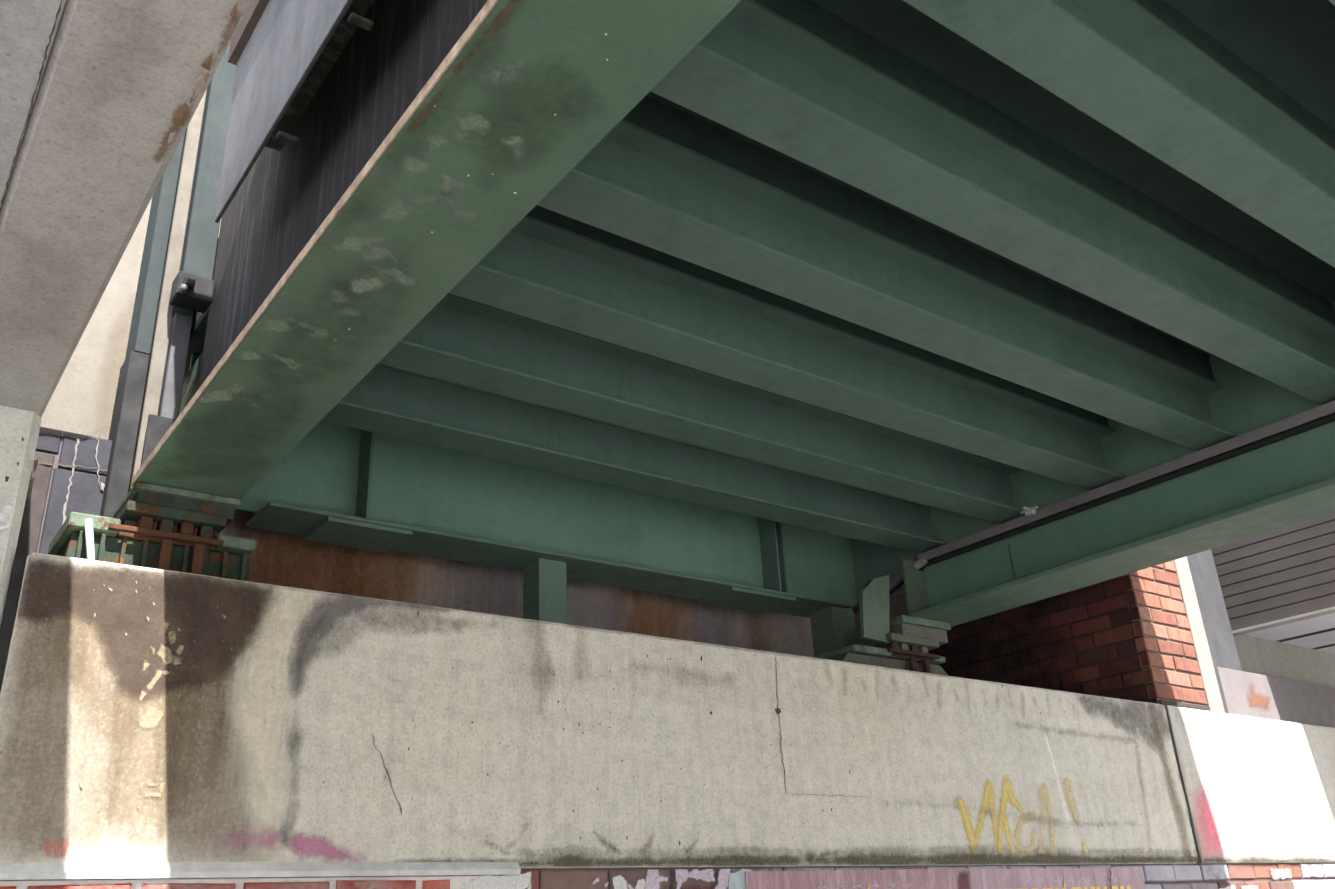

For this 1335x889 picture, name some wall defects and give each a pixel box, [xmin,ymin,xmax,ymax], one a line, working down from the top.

rust [131,0,519,487]
rust [634,591,679,639]
damp [0,560,438,851]
crack [775,656,867,797]
crack [372,735,402,815]
peeling [462,872,531,889]
peeling [613,875,646,889]